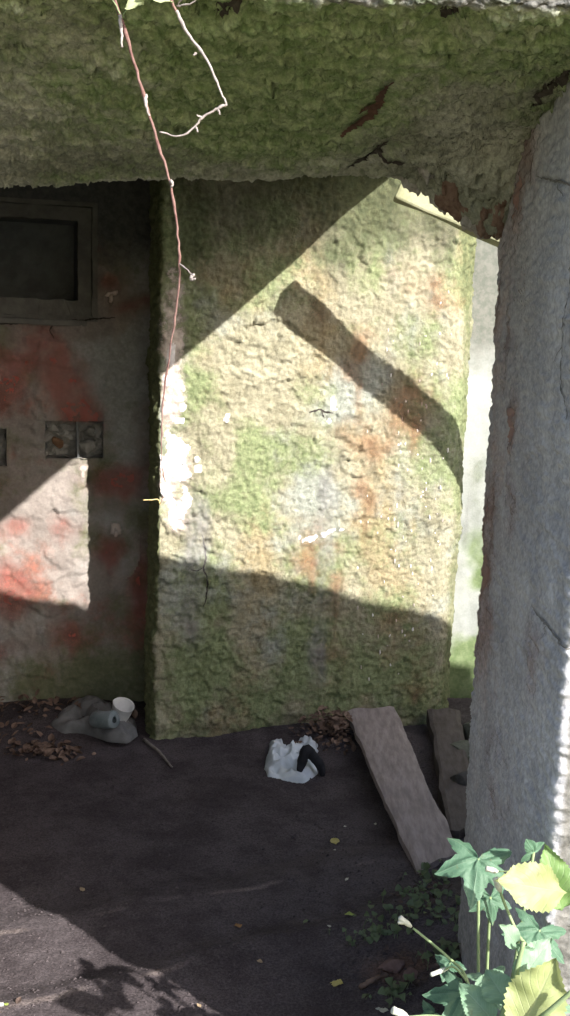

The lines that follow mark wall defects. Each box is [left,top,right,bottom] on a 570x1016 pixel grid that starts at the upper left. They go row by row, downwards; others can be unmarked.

spalling [400,168,511,240]
peeling [160,343,202,530]